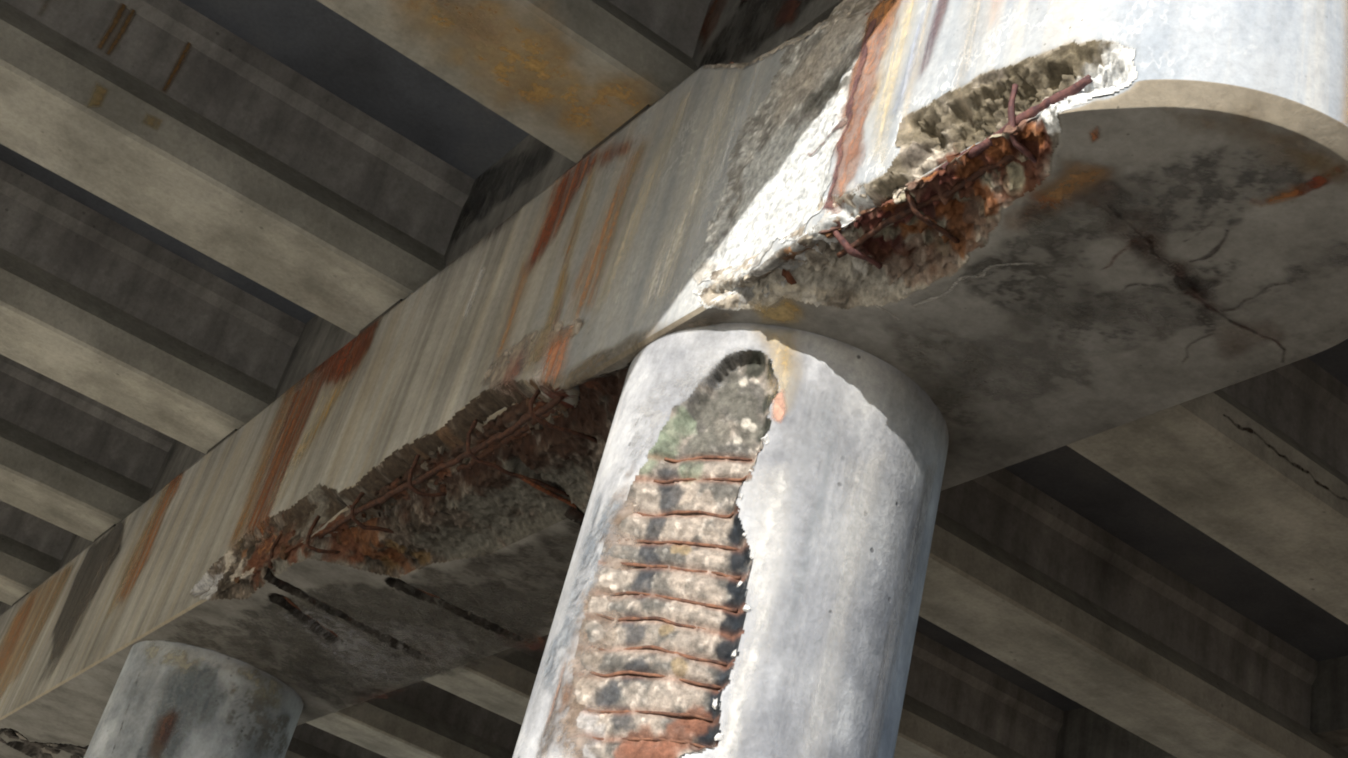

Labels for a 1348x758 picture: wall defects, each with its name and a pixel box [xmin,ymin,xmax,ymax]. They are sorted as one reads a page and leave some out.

corrosion [833,0,948,203]
spalling [697,40,1138,311]
damp [889,133,1348,425]
crack [1098,204,1285,362]
corrosion [0,568,72,697]
corrosion [108,473,183,615]
corrosion [151,712,177,757]
corrosion [231,322,378,542]
spalling [190,318,632,601]
spalling [568,349,779,758]